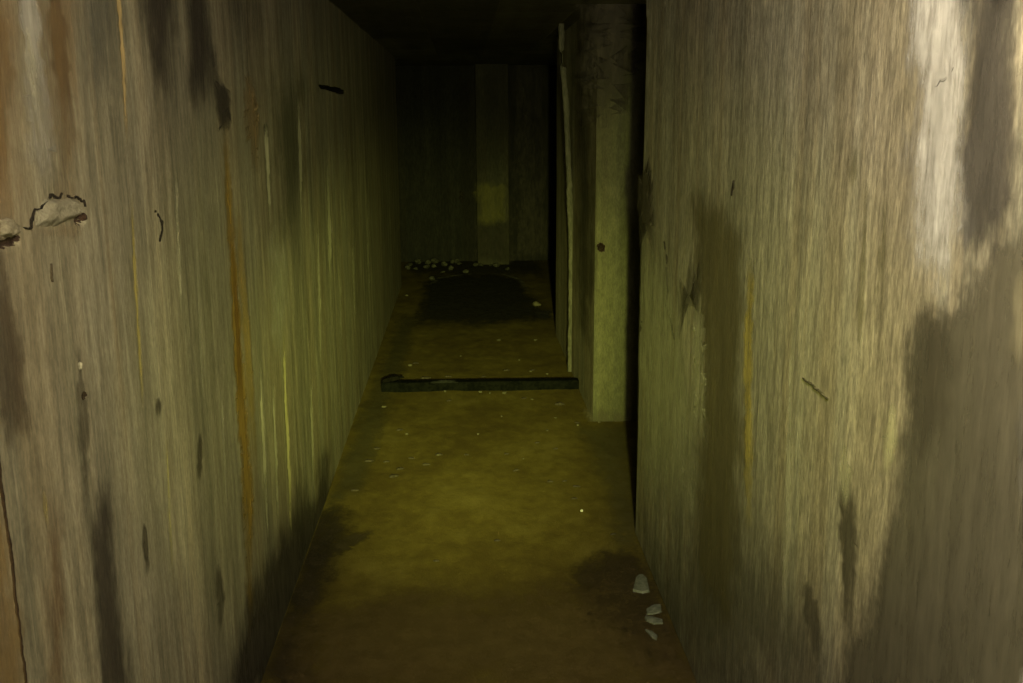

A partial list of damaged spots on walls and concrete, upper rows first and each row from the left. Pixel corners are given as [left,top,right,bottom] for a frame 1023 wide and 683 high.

corrosion [216,82,230,127]
crack [0,192,88,249]
crack [48,263,56,282]
corrosion [225,153,253,549]
leakage [846,0,1023,683]
crack [0,462,28,683]
leakage [840,450,855,615]